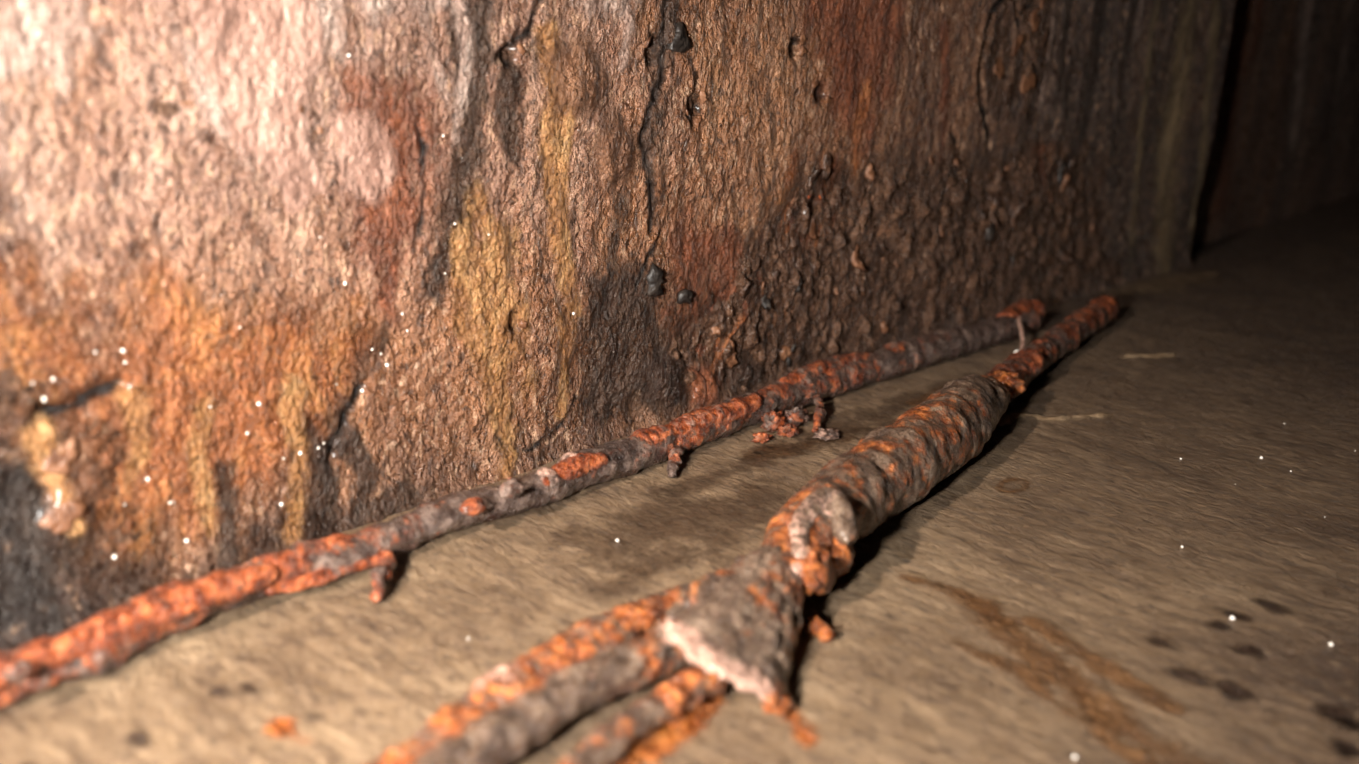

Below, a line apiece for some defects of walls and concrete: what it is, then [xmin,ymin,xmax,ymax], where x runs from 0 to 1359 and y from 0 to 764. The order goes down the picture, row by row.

crack [637,43,700,282]
corrosion [536,22,580,418]
corrosion [0,75,440,561]
corrosion [452,184,531,477]
crack [35,379,121,420]
crack [328,383,362,454]
corrosion [650,392,762,478]
corrosion [992,370,1026,399]
corrosion [790,537,856,597]
corrosion [0,550,397,691]
corrosion [803,616,834,643]
corrosion [613,682,722,764]